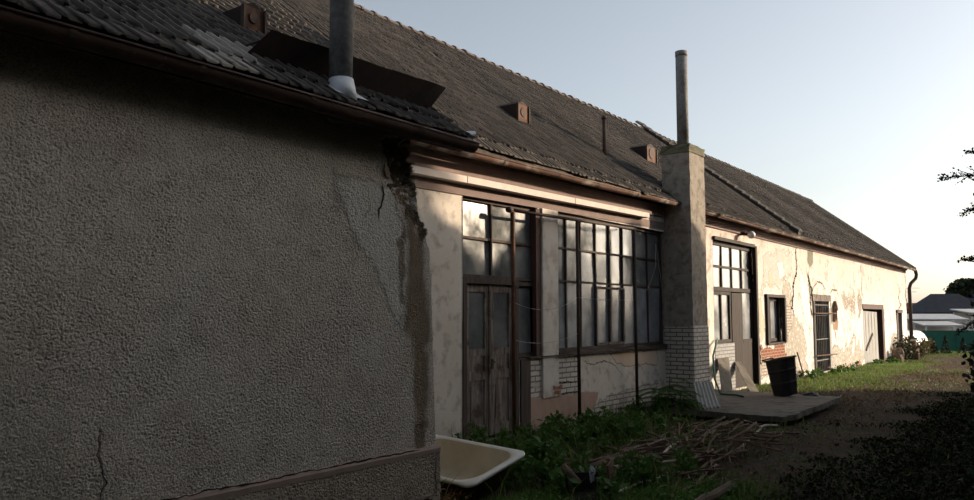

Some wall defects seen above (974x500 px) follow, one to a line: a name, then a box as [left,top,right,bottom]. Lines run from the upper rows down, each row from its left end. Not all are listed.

crack [366,183,385,219]
damp [397,219,429,449]
flaking render [610,349,658,366]
flaking render [759,269,811,379]
crack [790,248,837,316]
peeling [830,323,864,371]
peeling [842,288,862,318]
flaking render [531,356,658,434]
crack [96,431,108,500]
crack [162,450,437,500]